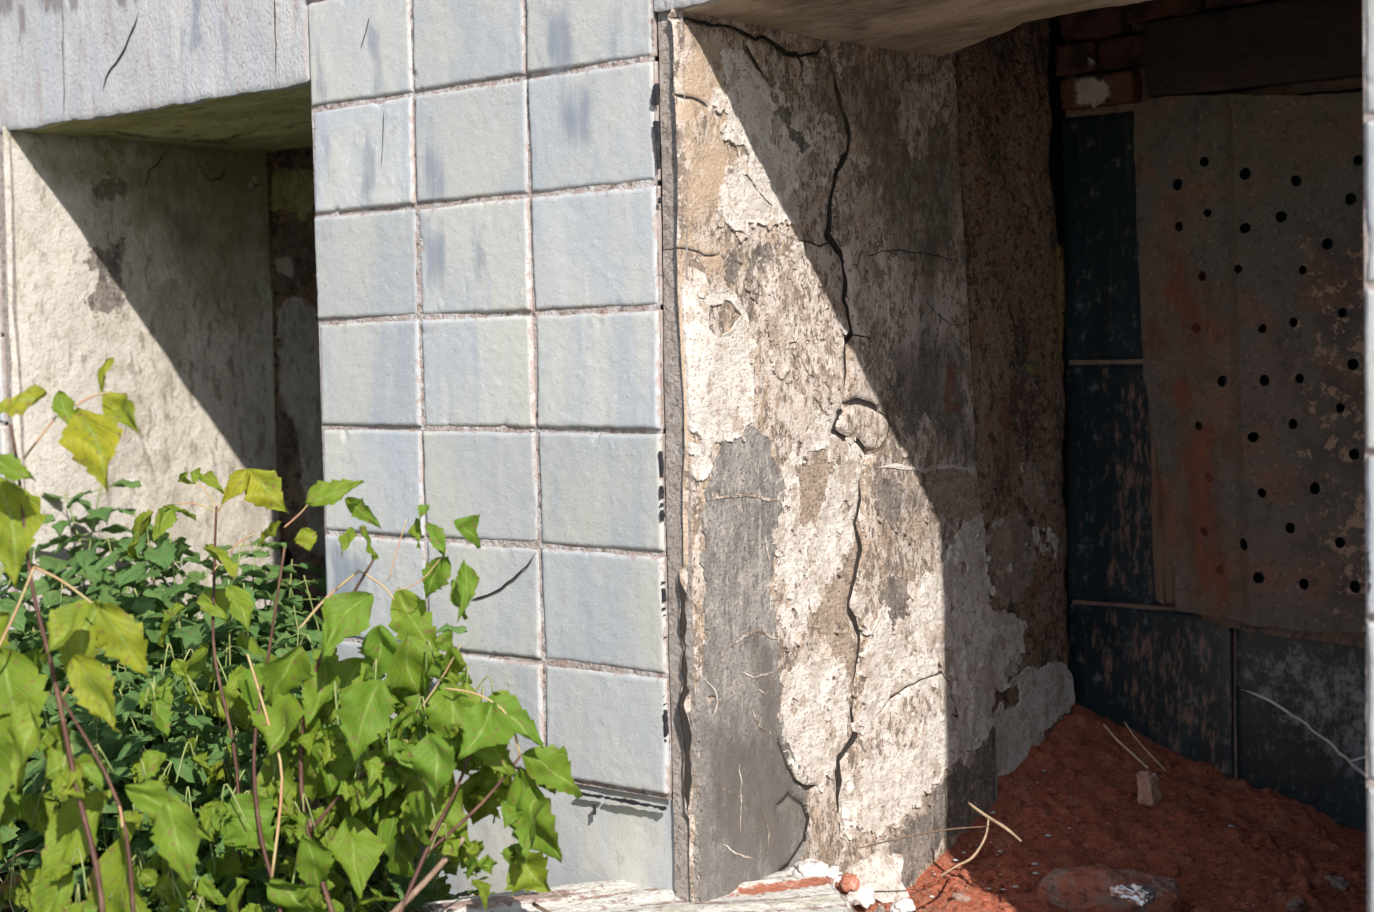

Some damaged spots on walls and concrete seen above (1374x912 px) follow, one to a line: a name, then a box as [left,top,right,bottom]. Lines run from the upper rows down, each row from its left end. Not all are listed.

flaking render [92,171,131,201]
flaking render [270,167,315,226]
flaking render [83,237,128,317]
flaking render [274,256,295,278]
flaking render [276,296,325,556]
crack [663,16,960,872]
flaking render [681,48,1075,903]
crack [470,553,536,601]